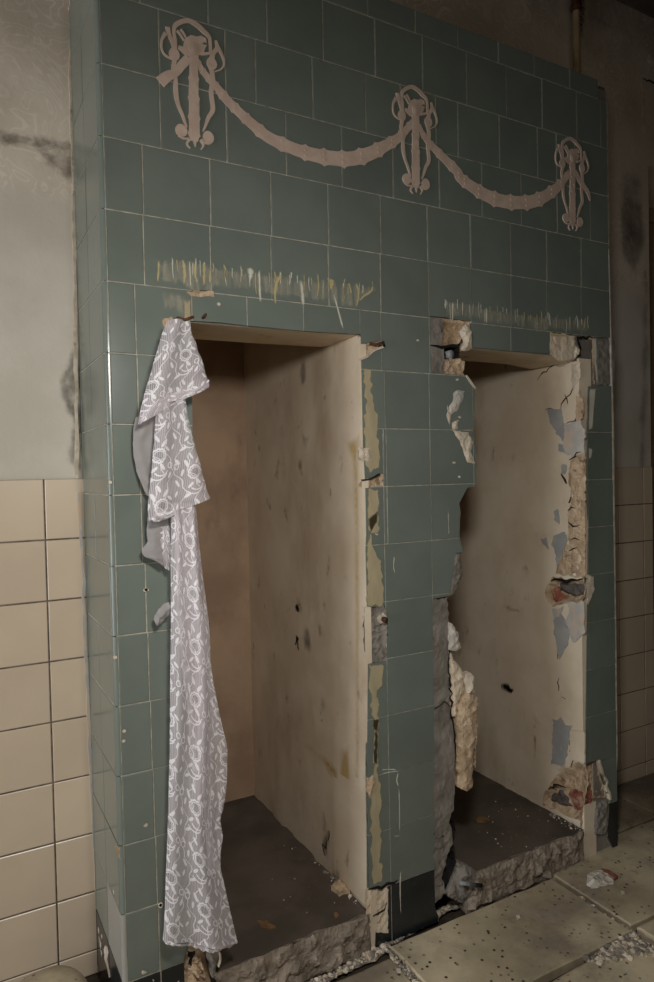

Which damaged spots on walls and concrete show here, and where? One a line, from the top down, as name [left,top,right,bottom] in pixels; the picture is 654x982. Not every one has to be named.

spalling [416,318,476,464]
peeling [541,332,615,659]
spalling [178,341,398,982]
spalling [433,553,619,912]
peeling [98,927,110,977]